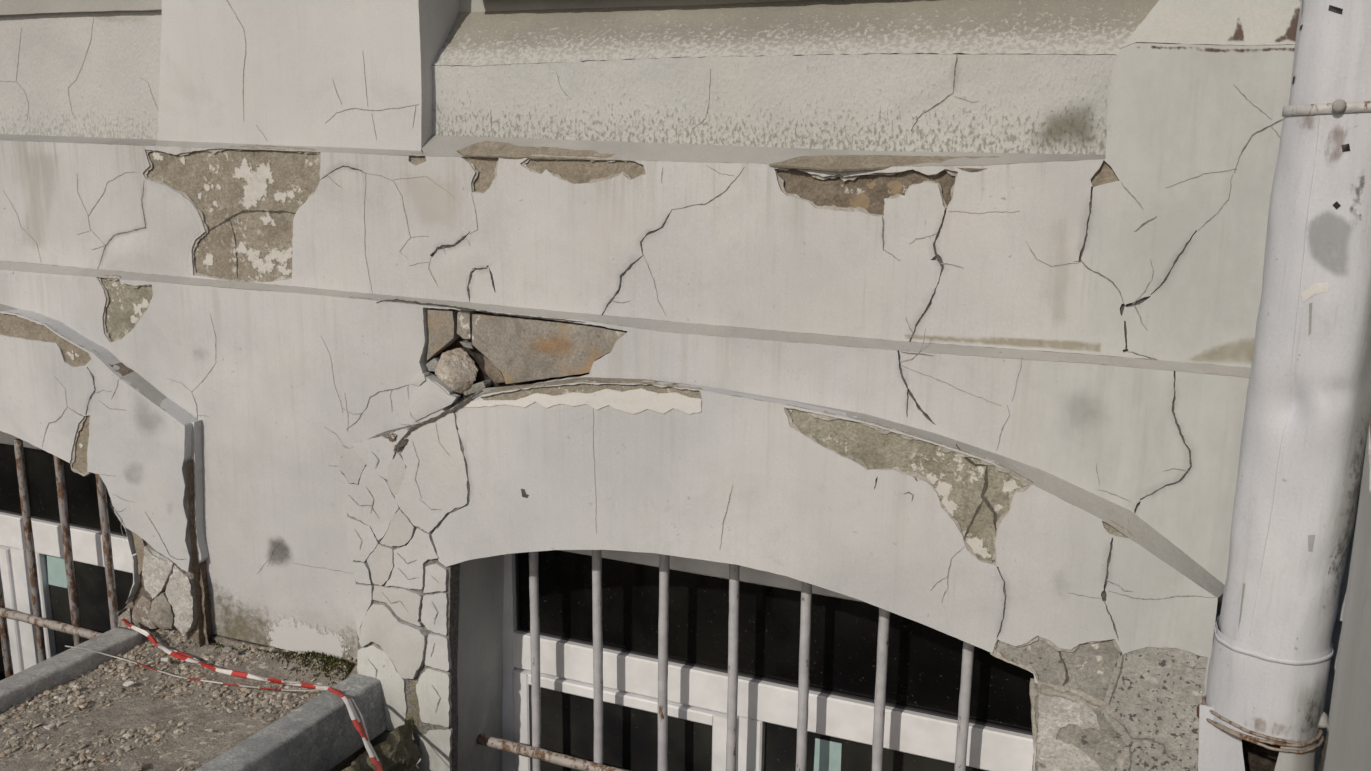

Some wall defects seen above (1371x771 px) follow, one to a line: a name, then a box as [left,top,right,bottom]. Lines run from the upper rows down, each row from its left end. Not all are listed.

crack [77,172,146,269]
spalling [144,145,321,284]
crack [327,166,744,323]
spalling [457,141,645,193]
spalling [407,308,703,421]
spalling [769,155,997,216]
crack [882,85,1283,513]
crack [257,337,483,771]
spalling [785,406,1034,565]
crack [997,567,1007,637]
spalling [990,636,1128,771]
crack [1068,538,1216,771]